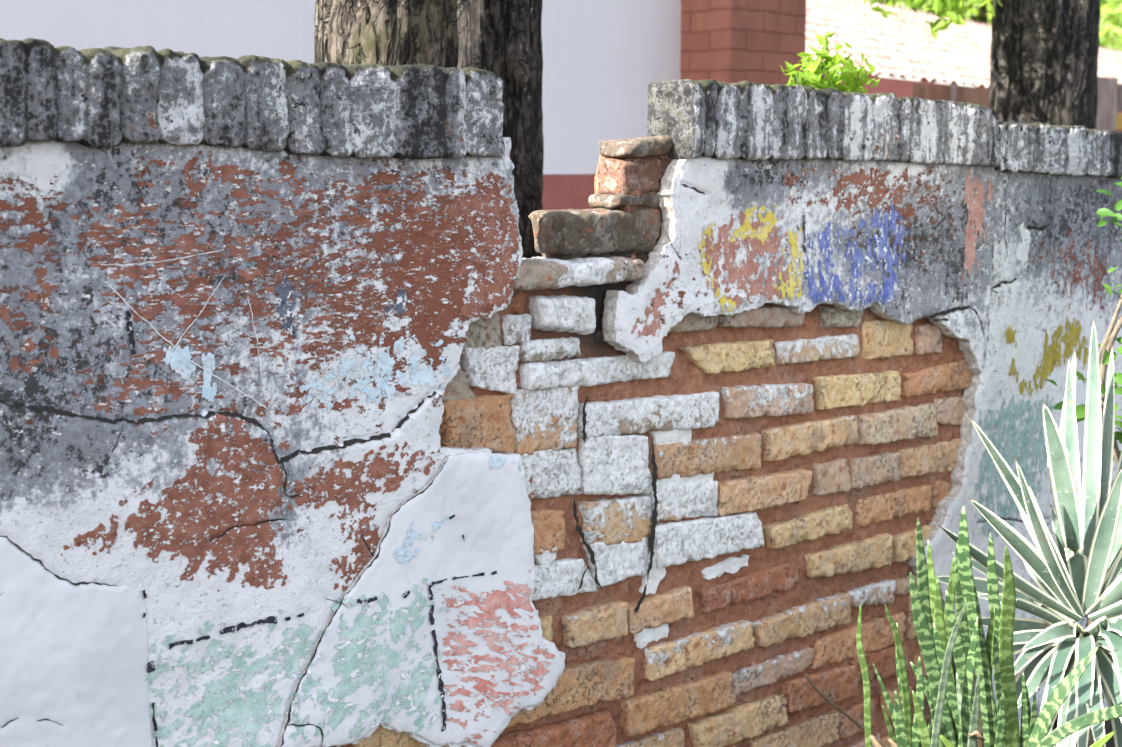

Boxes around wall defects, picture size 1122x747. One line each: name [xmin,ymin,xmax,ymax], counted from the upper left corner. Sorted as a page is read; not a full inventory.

peeling [16,145,67,191]
peeling [20,260,58,312]
peeling [0,305,60,375]
crack [0,388,439,541]
flaking render [61,135,1107,747]
crack [581,396,589,443]
crack [0,536,121,586]
crack [573,498,602,592]
crack [634,437,658,615]